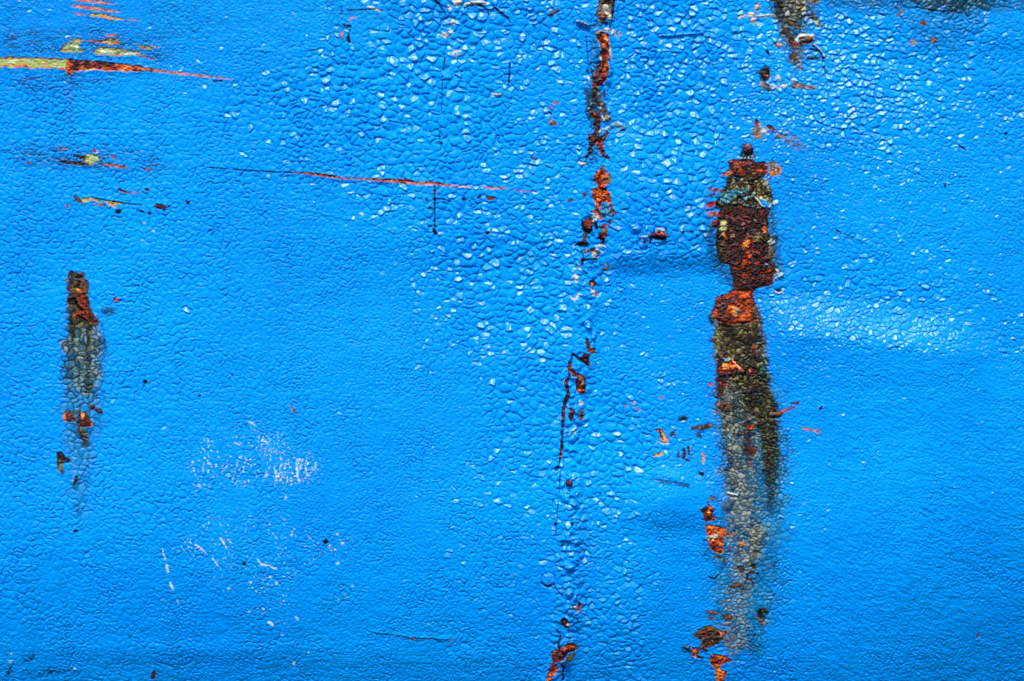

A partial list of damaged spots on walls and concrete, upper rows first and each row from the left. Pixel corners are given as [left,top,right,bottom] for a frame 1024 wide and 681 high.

corrosion [770,0,823,70]
corrosion [567,0,621,228]
corrosion [716,159,784,292]
corrosion [57,452,78,486]
corrosion [61,271,106,445]
corrosion [713,320,779,525]
corrosion [546,643,578,681]
corrosion [683,496,749,681]
corrosion [757,608,768,626]